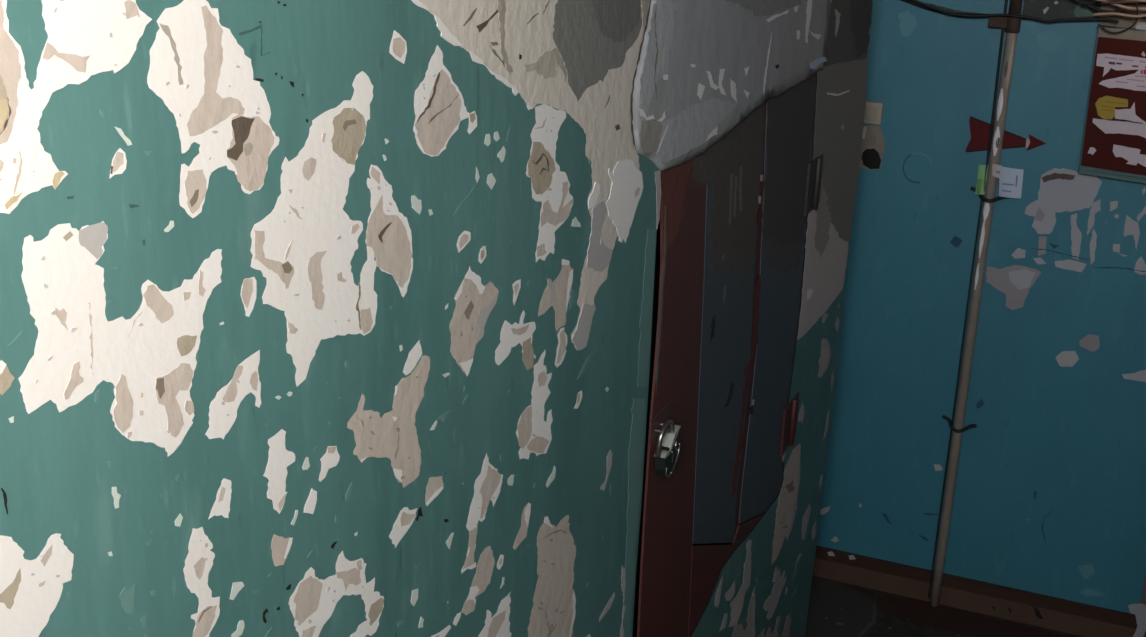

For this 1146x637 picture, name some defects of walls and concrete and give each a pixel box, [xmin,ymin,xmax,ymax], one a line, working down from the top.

peeling [0,221,222,456]
peeling [0,0,433,400]
peeling [205,350,261,440]
flaking render [263,231,499,566]
flaking render [411,0,661,637]
peeling [975,168,1146,310]
crack [1031,248,1146,272]
peeling [0,533,74,637]
peeling [175,478,245,637]
peeling [289,551,384,637]
flaking render [714,444,831,637]
crack [1138,576,1146,605]